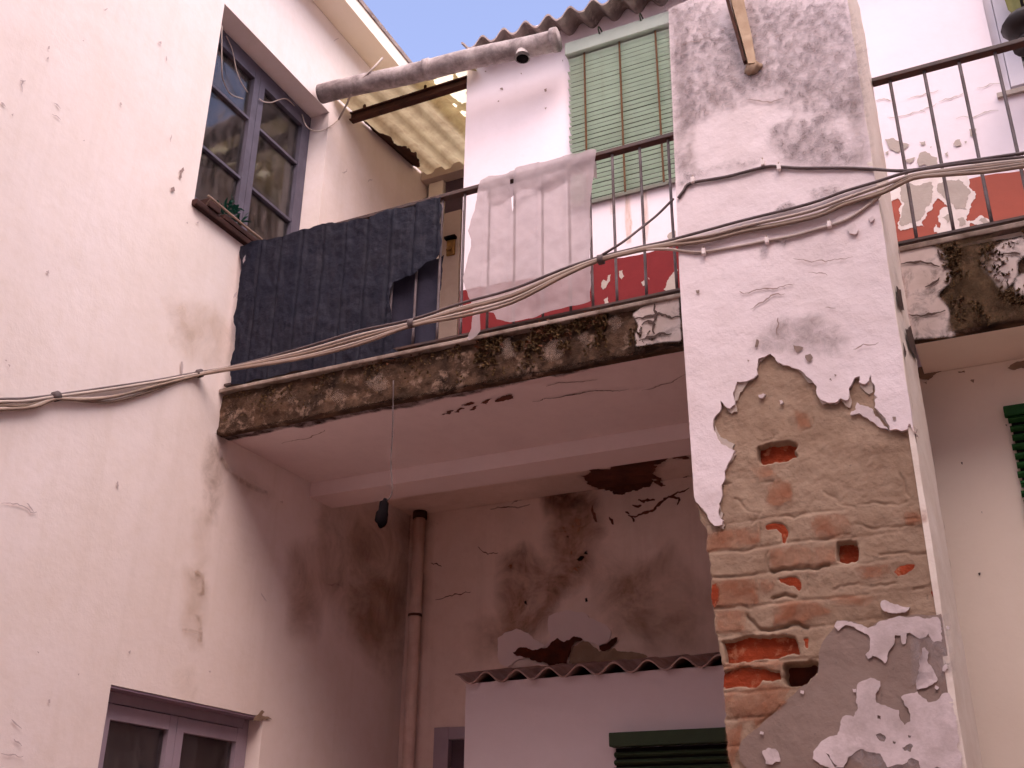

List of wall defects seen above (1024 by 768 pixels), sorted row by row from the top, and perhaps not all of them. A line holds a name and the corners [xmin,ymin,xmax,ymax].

leakage [672,0,856,162]
peeling [885,129,990,233]
peeling [601,271,624,303]
peeling [664,269,678,291]
spalling [896,286,904,311]
spalling [903,326,941,384]
peeling [1008,360,1024,370]
leakage [222,343,681,440]
peeling [442,394,513,415]
crack [591,488,689,525]
spalling [697,355,962,768]
spalling [513,636,648,665]